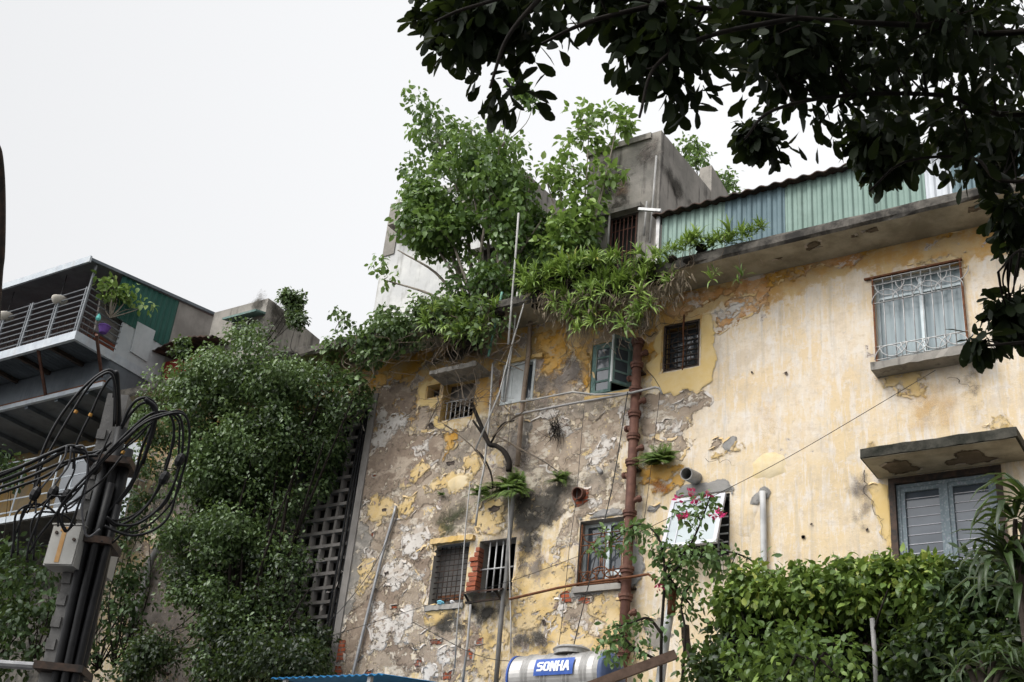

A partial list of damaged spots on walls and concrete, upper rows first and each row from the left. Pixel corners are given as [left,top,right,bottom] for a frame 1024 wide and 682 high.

damp [638,138,691,203]
flaking render [712,291,770,335]
flaking render [708,436,737,454]
flaking render [327,344,714,682]
damp [514,484,566,576]